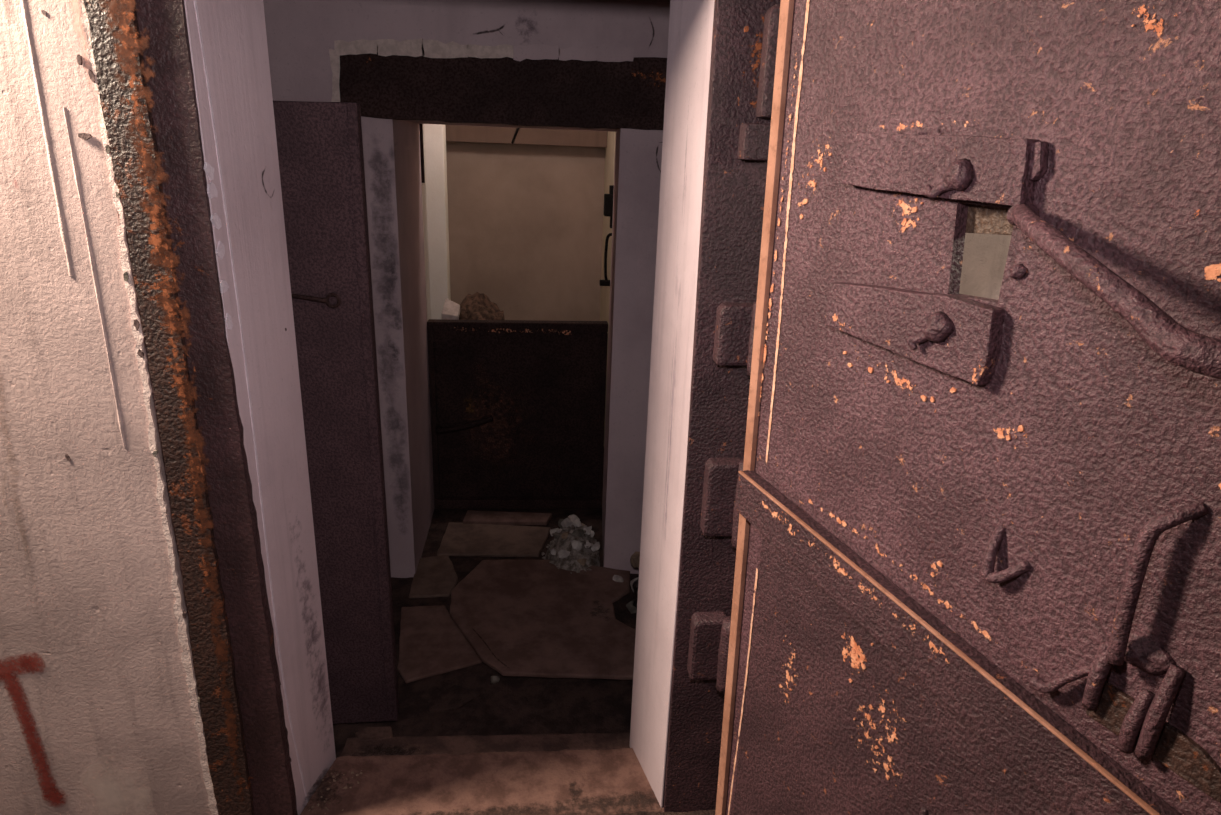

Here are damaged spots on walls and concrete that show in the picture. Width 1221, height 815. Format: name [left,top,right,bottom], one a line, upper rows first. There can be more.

rust [742,17,764,119]
rust [100,0,244,801]
rust [758,141,789,416]